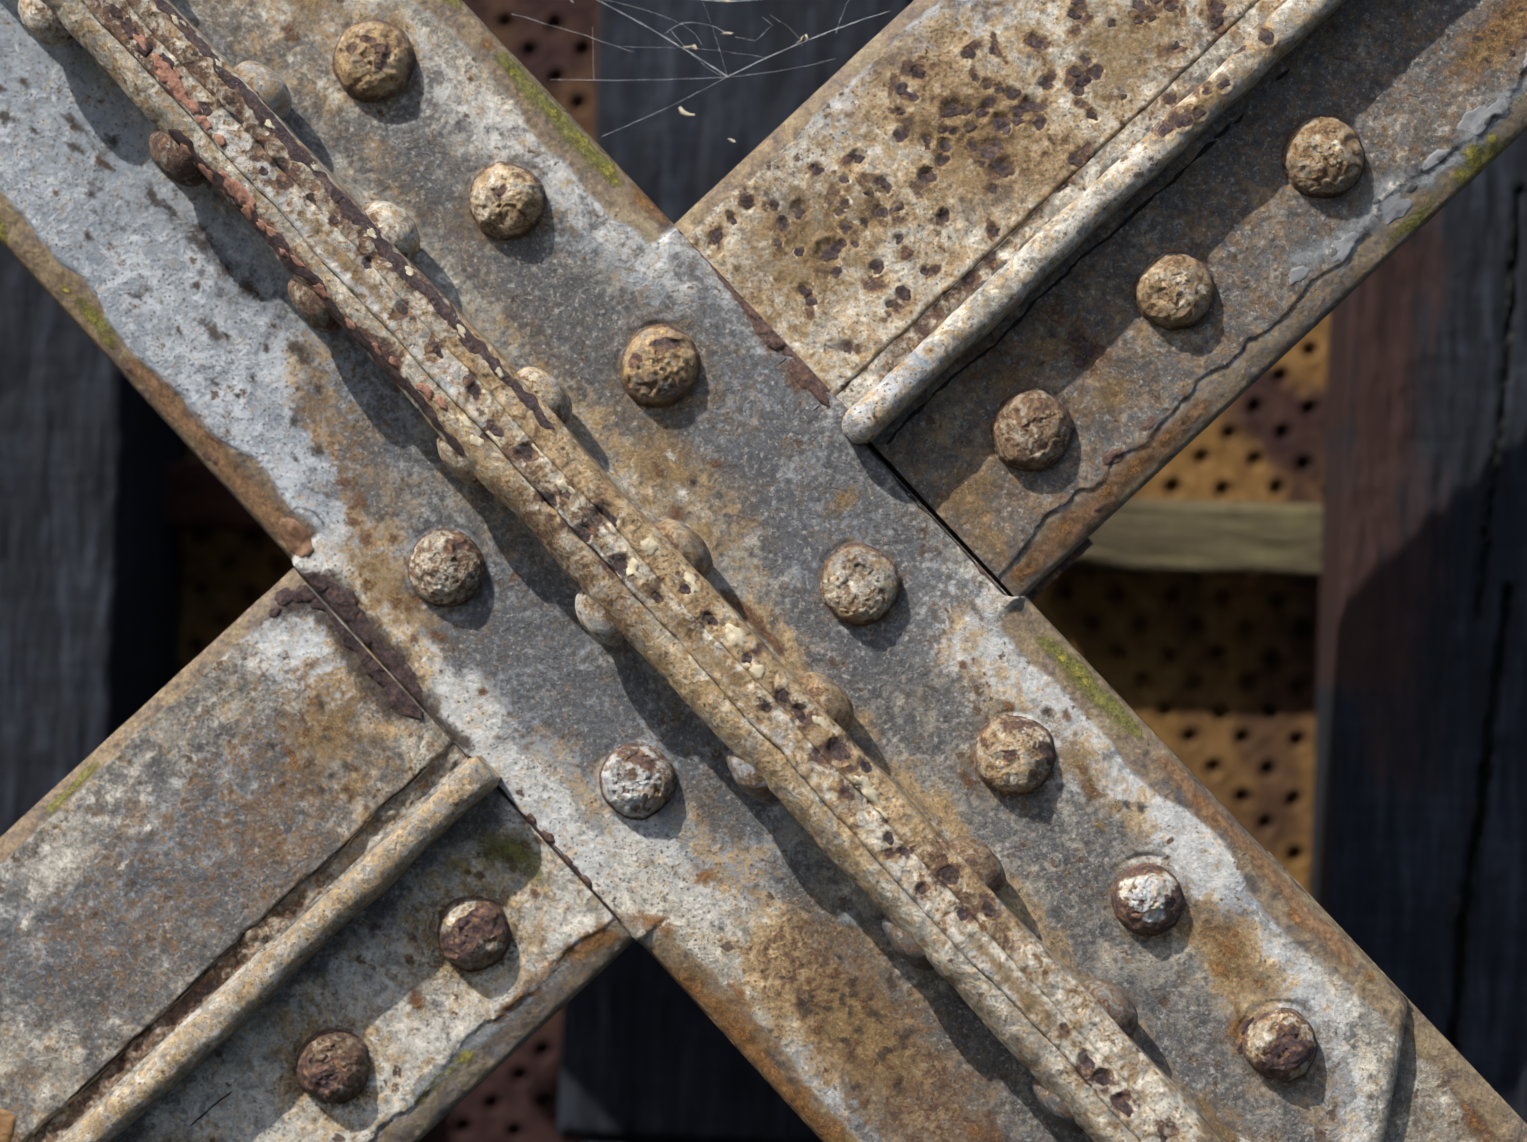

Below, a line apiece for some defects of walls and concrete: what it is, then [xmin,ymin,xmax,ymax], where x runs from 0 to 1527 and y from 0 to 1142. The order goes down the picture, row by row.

corrosion [462,0,600,140]
corrosion [64,114,118,171]
corrosion [146,184,176,216]
corrosion [153,0,554,430]
corrosion [744,304,831,408]
corrosion [124,360,472,751]
corrosion [1010,314,1375,988]
corrosion [695,868,713,884]
corrosion [419,1009,585,1142]
corrosion [667,969,850,1142]
corrosion [778,954,911,1106]
corrosion [1227,1010,1254,1055]